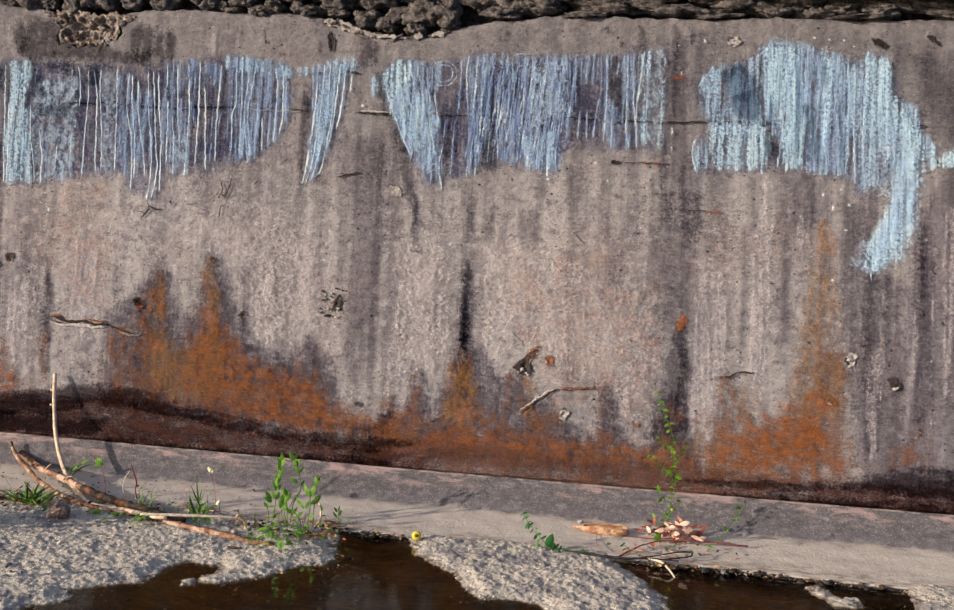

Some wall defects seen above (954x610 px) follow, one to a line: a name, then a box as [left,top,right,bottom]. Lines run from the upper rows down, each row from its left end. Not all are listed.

spalling [45,10,135,49]
crack [50,314,140,336]
spalling [513,346,554,376]
rust [0,269,954,515]
damp [0,383,412,467]
damp [686,470,954,515]